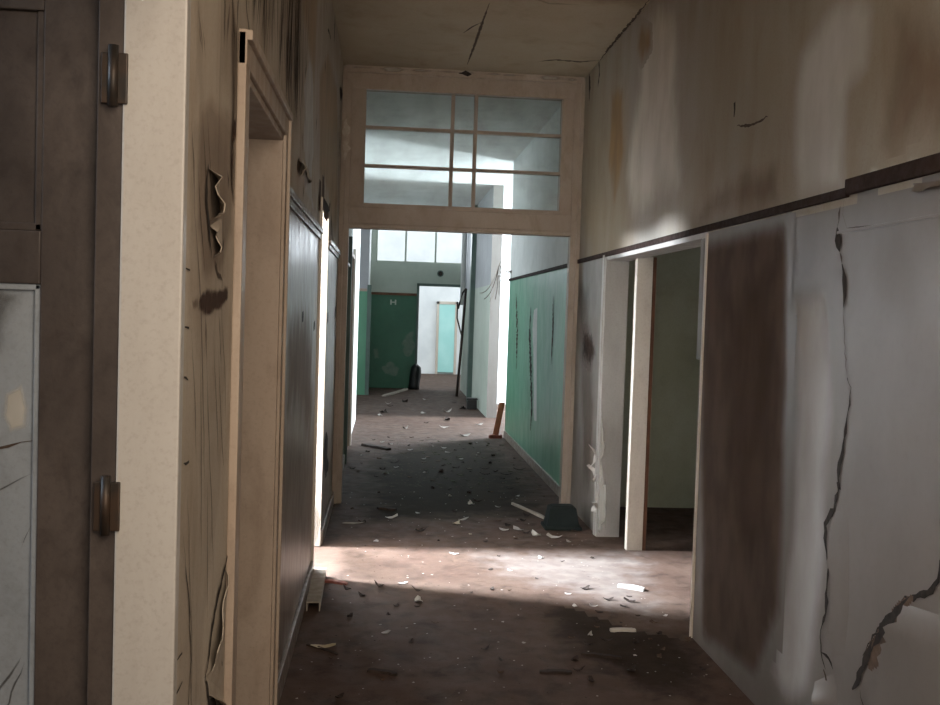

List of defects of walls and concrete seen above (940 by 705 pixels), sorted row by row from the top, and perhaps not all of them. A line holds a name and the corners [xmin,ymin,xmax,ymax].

crack [465,5,489,65]
peeling [206,164,229,279]